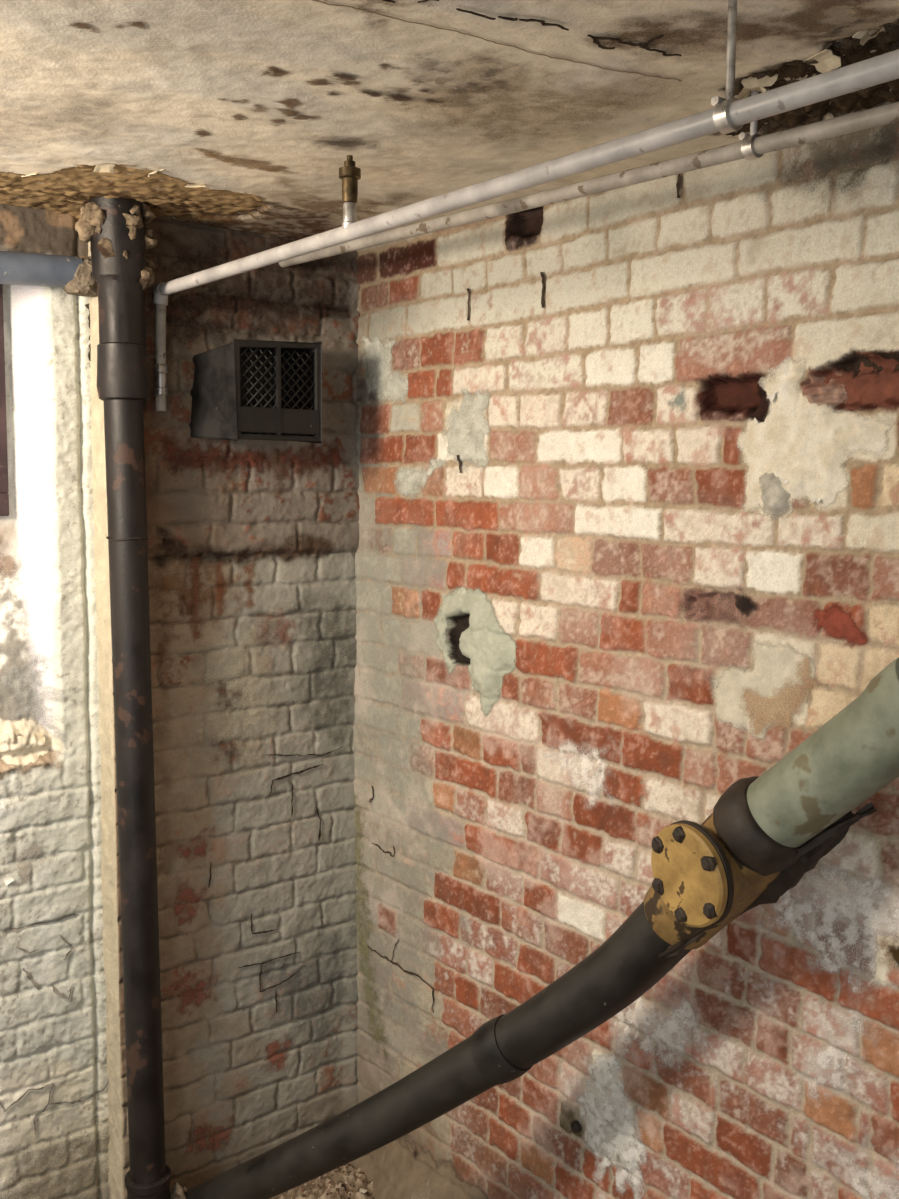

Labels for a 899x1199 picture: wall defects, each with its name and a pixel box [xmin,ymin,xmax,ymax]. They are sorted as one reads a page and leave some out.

crack [313,0,682,82]
flaking render [720,21,899,96]
water stain [220,99,319,125]
water stain [307,58,645,140]
flaking render [710,78,899,136]
flaking render [0,163,270,227]
spalling [696,372,770,423]
crack [264,748,340,841]
crack [368,939,434,1013]
water stain [613,996,697,1065]
crack [0,1082,108,1135]
water stain [594,1151,642,1199]